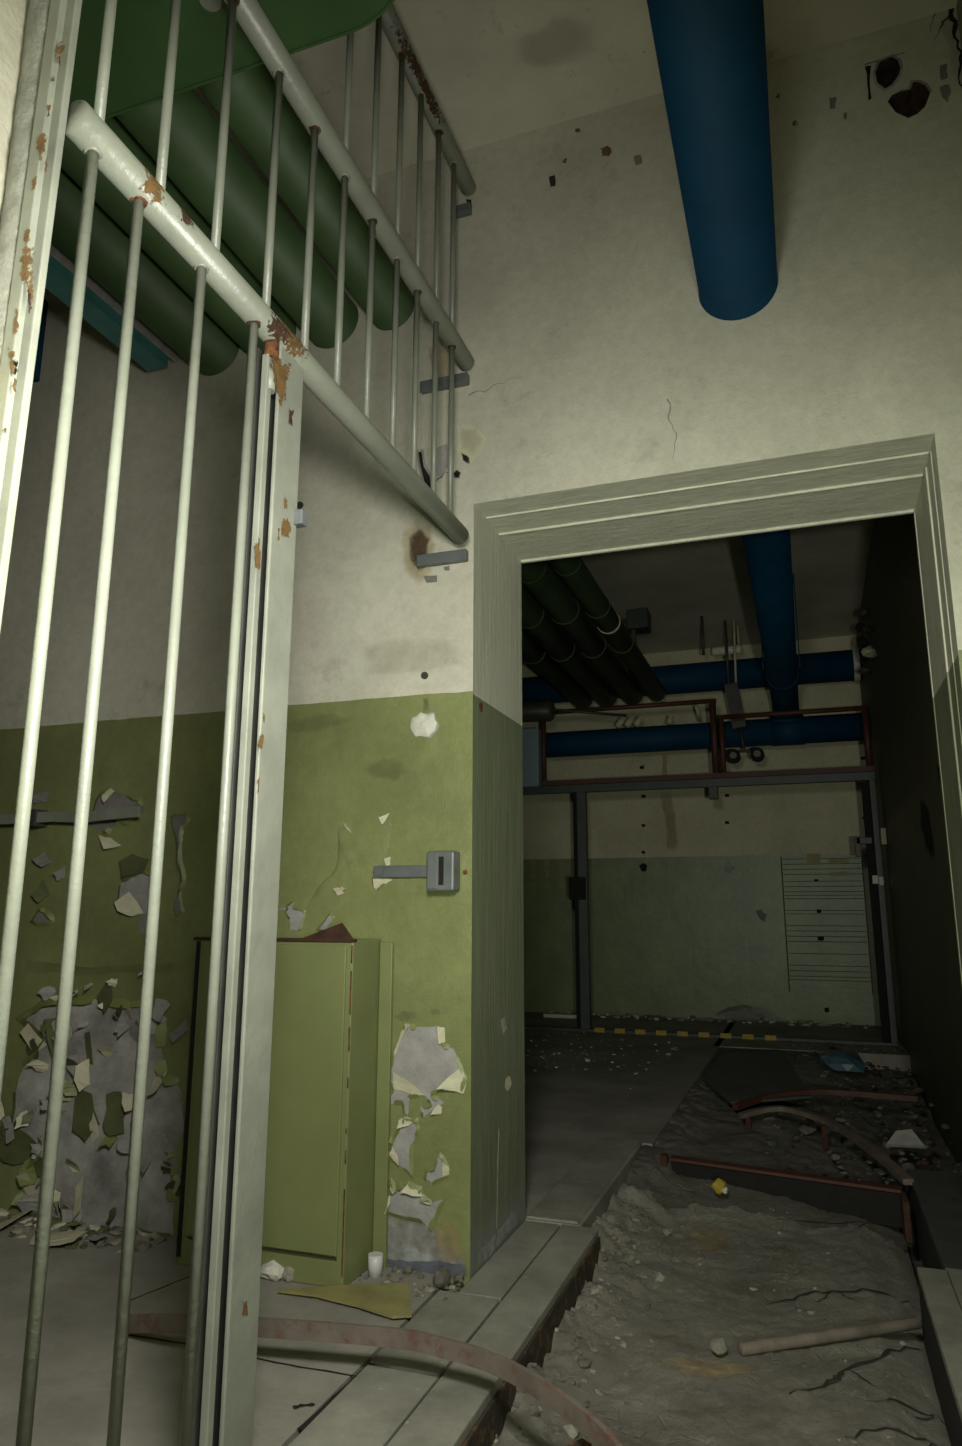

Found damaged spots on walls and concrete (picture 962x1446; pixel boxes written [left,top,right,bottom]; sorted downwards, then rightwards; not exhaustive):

spalling [865,52,905,100]
crack [930,8,962,87]
corrosion [32,105,51,190]
corrosion [139,168,165,204]
corrosion [8,229,34,392]
corrosion [267,312,309,425]
corrosion [410,531,429,569]
peeling [171,813,191,917]
peeling [0,979,190,1236]
peeling [384,1023,468,1232]
crack [772,1288,909,1303]
crack [789,1346,945,1446]